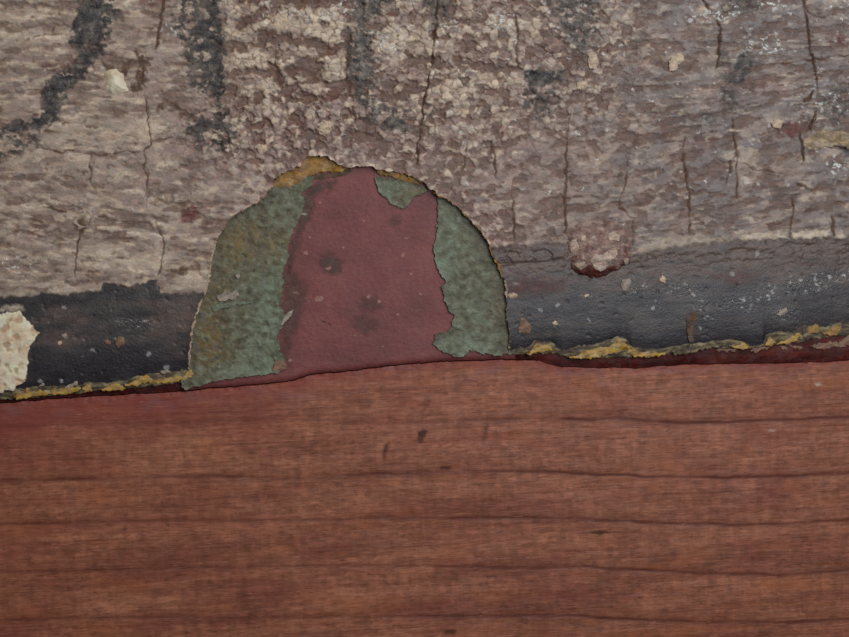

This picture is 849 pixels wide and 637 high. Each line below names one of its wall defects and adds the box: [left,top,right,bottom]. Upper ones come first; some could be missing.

crack [416,1,439,164]
crack [666,0,848,236]
peeling [0,156,849,400]